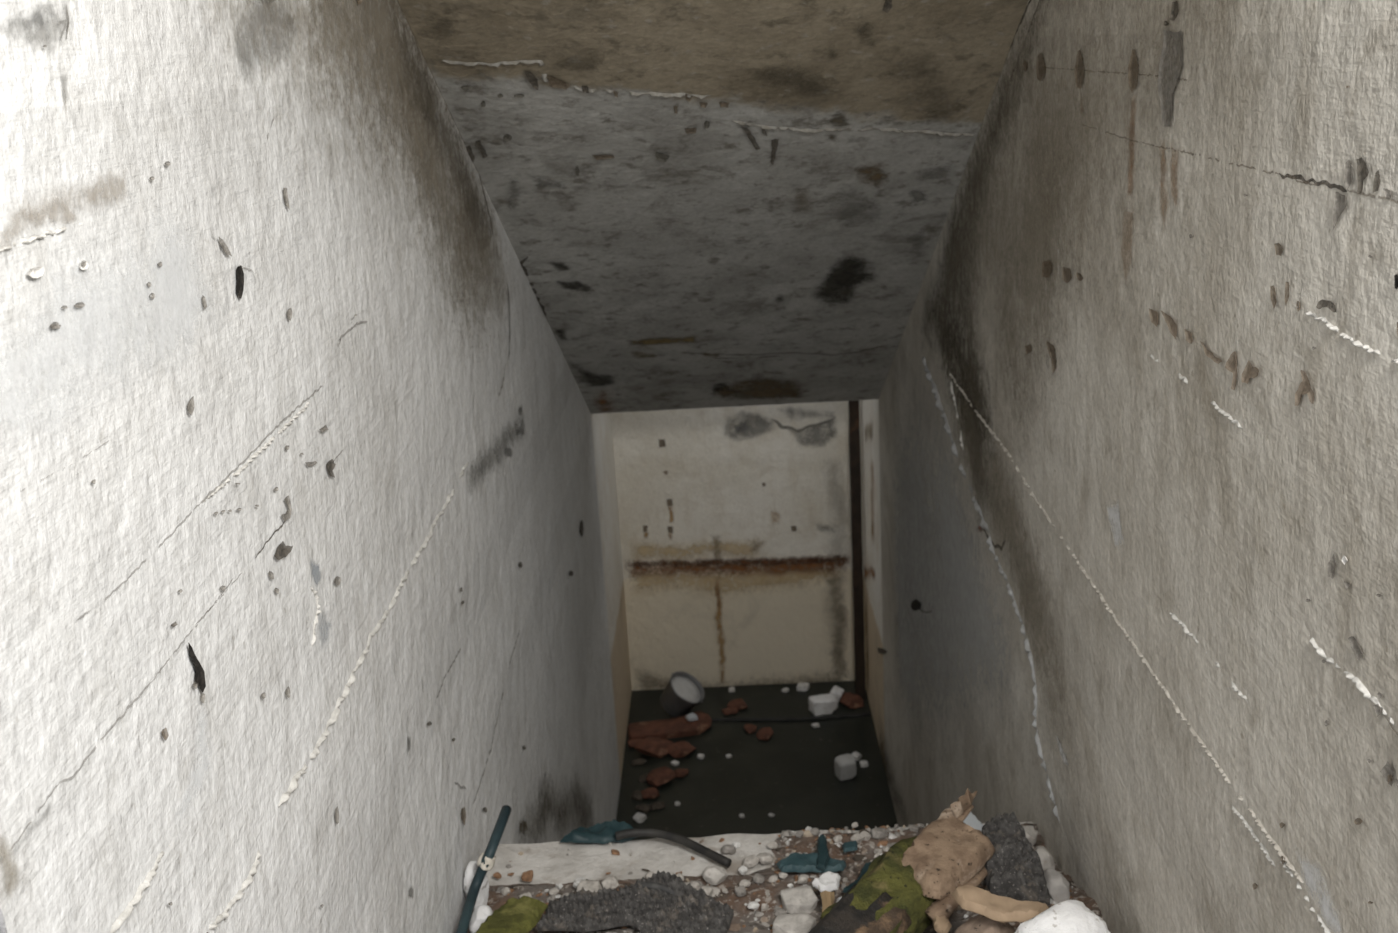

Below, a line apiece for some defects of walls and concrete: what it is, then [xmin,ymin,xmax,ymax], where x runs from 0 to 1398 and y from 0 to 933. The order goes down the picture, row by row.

water stain [238,0,488,296]
rust [1161,150,1177,217]
crack [1279,173,1347,192]
water stain [816,257,873,303]
rust [632,556,848,682]